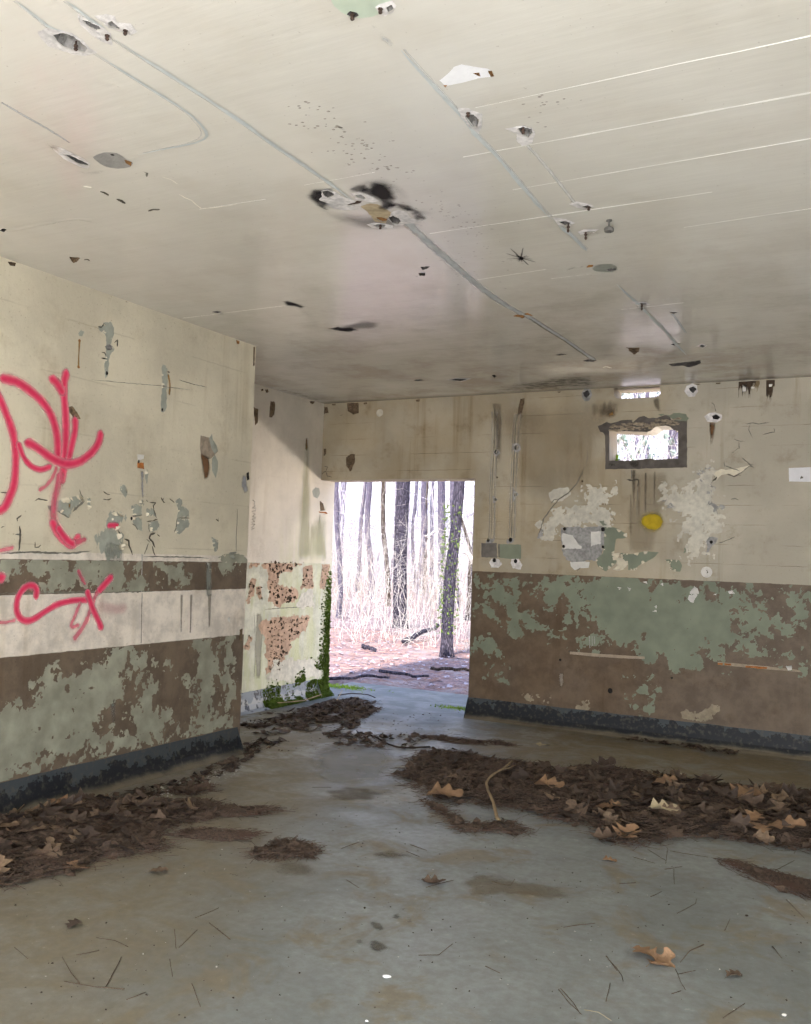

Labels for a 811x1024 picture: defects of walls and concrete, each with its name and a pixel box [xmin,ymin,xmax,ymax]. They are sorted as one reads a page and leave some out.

spalling [38,14,137,56]
spalling [319,189,492,237]
peeling [98,322,118,378]
peeling [0,484,193,593]
peeling [470,413,811,716]
peeling [0,537,330,782]
peeling [680,704,720,722]